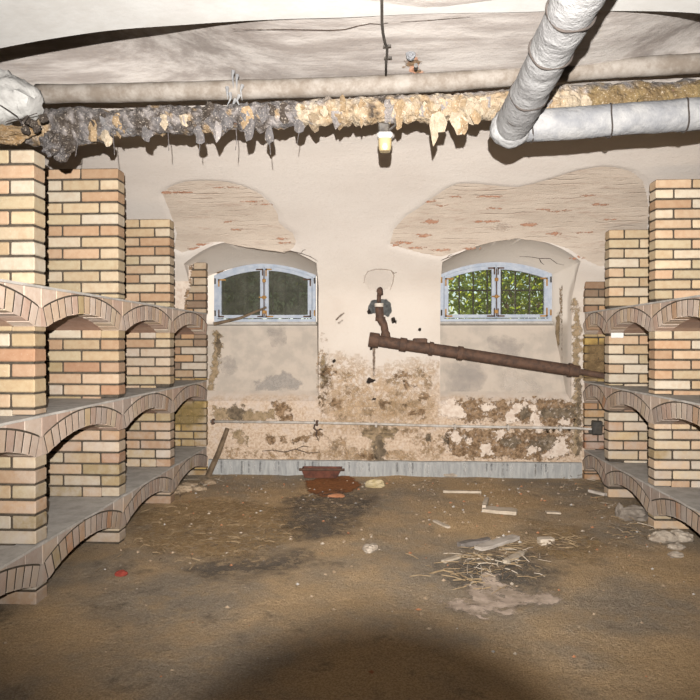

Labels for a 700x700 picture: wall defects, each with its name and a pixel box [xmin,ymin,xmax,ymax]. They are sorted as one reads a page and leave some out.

peeling [88,113,168,147]
peeling [179,94,346,145]
peeling [358,94,500,146]
peeling [542,88,561,109]
spalling [161,181,296,253]
spalling [390,167,649,267]
damp [318,351,431,430]
damp [402,429,449,477]